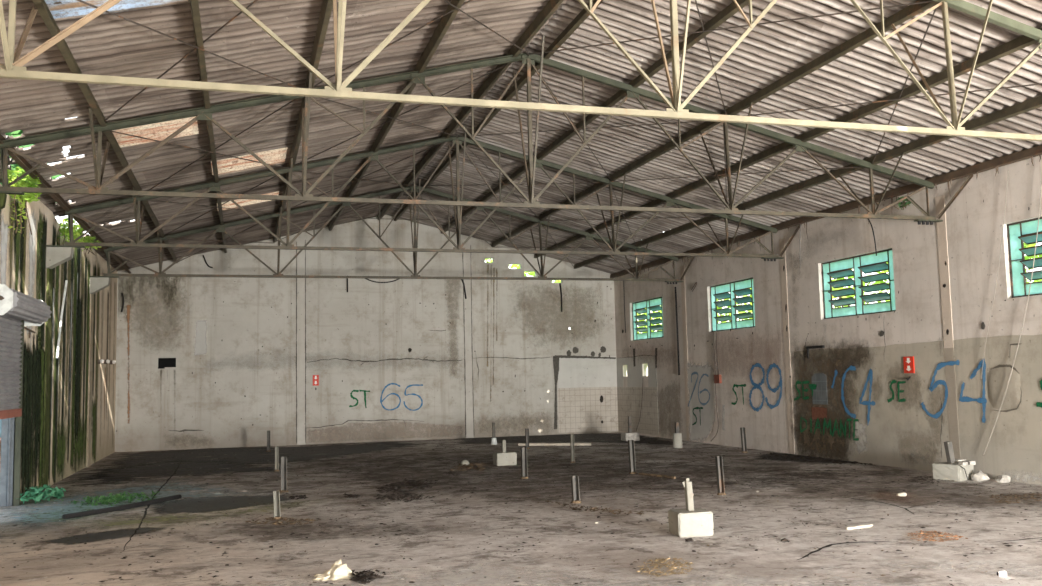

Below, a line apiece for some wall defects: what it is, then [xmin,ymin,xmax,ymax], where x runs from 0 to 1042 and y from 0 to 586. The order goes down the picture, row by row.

damp [756,347,868,464]
crack [123,464,180,551]